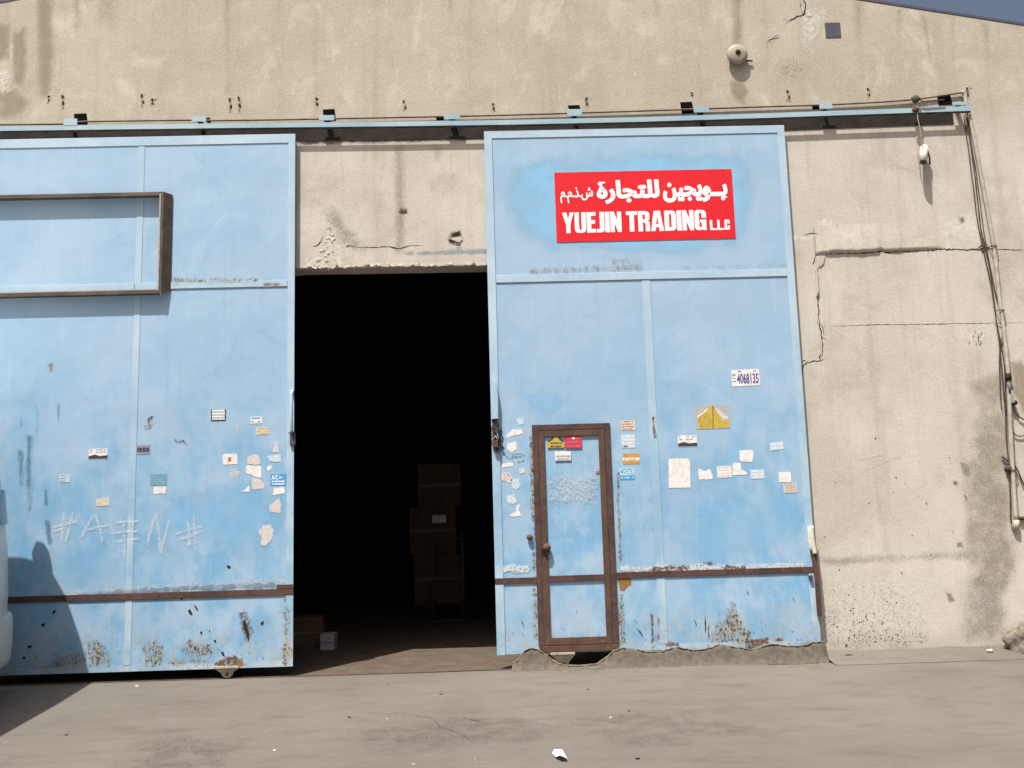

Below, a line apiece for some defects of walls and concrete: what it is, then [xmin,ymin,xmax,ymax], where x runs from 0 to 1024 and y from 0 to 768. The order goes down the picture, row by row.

crack [767,0,814,42]
corrosion [171,276,281,286]
crack [316,227,424,249]
spalling [299,229,487,270]
crack [802,225,1024,371]
damp [820,359,1024,646]
corrosion [47,640,110,671]
corrosion [63,565,293,668]
corrosion [503,552,538,640]
corrosion [615,471,806,647]